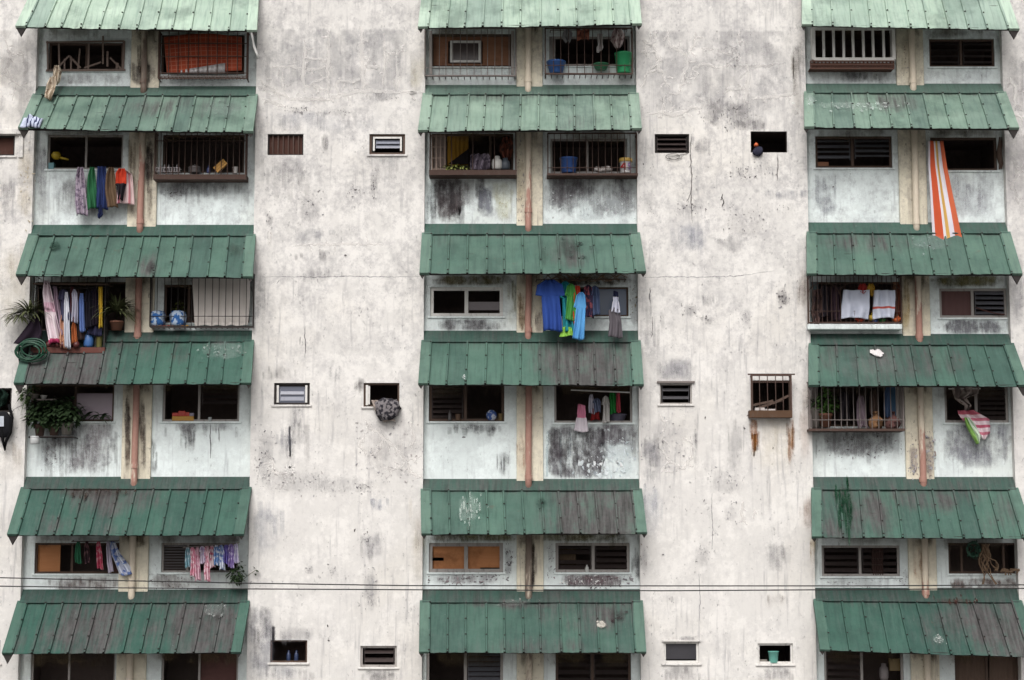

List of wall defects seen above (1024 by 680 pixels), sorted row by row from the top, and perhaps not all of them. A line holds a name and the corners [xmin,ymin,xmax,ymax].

damp [435,179,491,219]
damp [552,179,592,207]
crack [686,135,694,209]
damp [125,402,145,465]
damp [546,425,633,477]